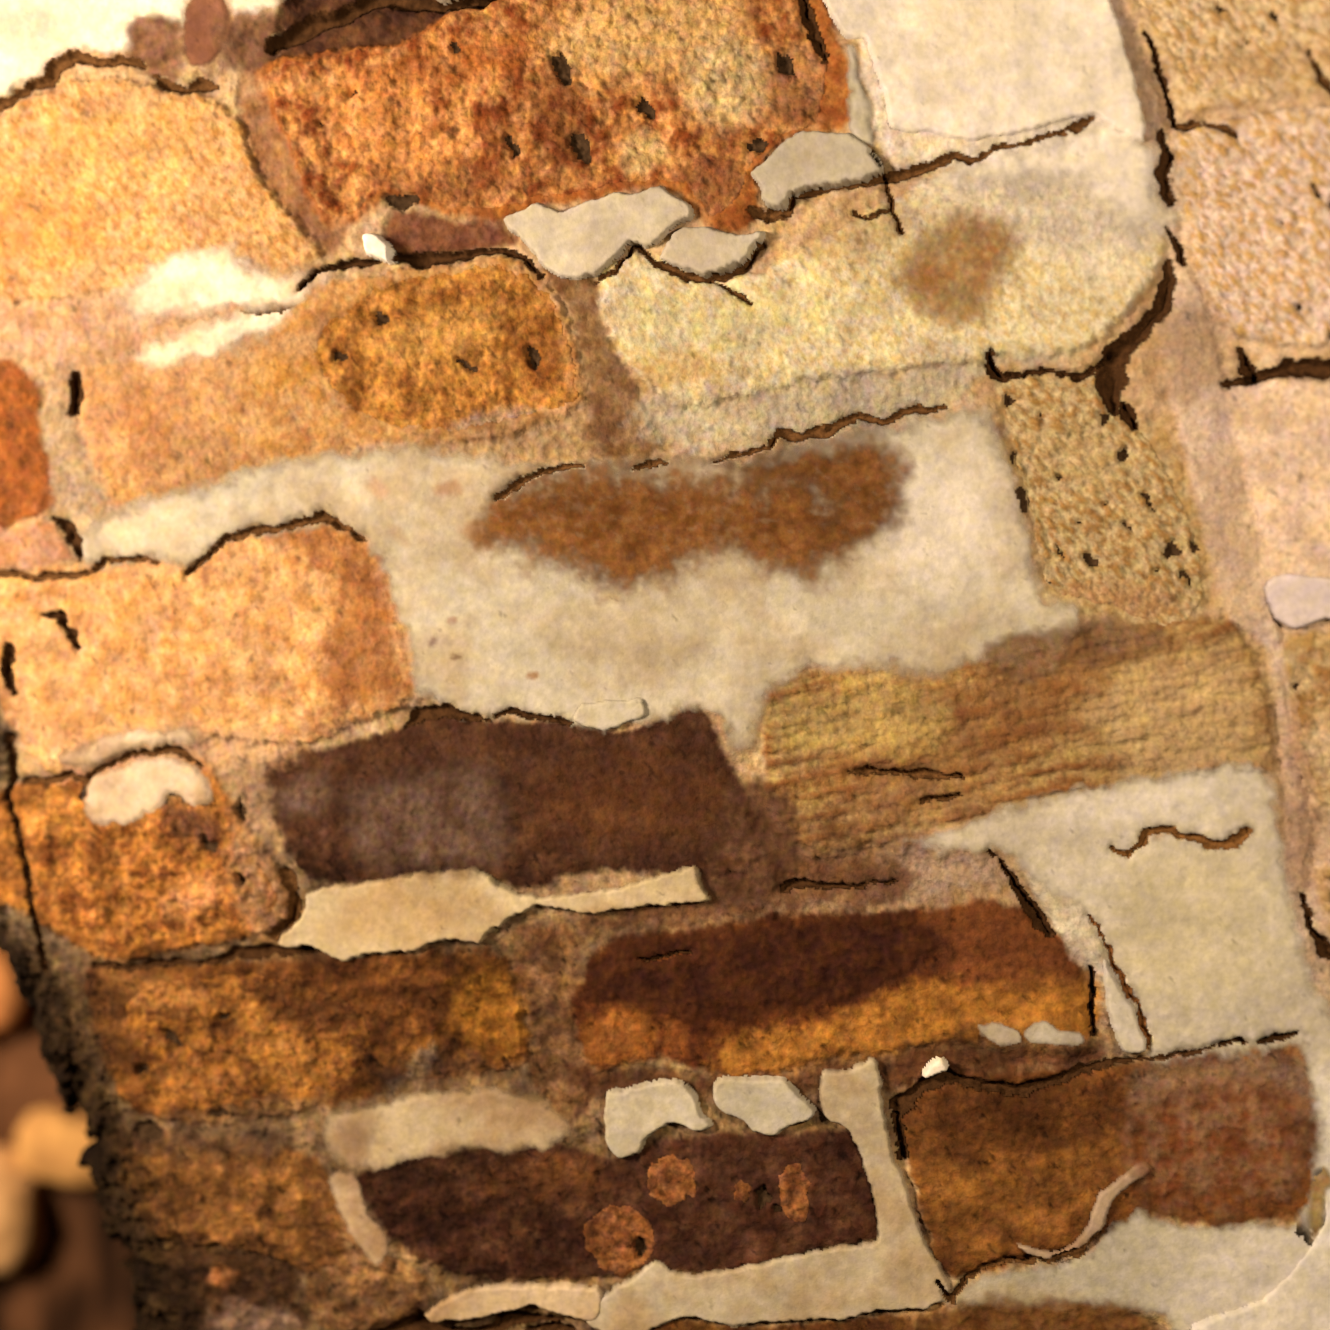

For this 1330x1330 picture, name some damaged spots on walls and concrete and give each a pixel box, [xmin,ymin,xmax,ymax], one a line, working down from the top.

crack [0,49,218,112]
spalling [1136,0,1330,91]
spalling [264,0,1178,432]
crack [595,115,1095,305]
crack [985,31,1237,431]
spalling [1197,122,1330,339]
crack [1221,347,1330,389]
crack [0,510,365,651]
water stain [477,442,909,589]
peeling [424,764,1330,1330]
crack [890,914,1299,1160]
peeling [324,1087,568,1263]